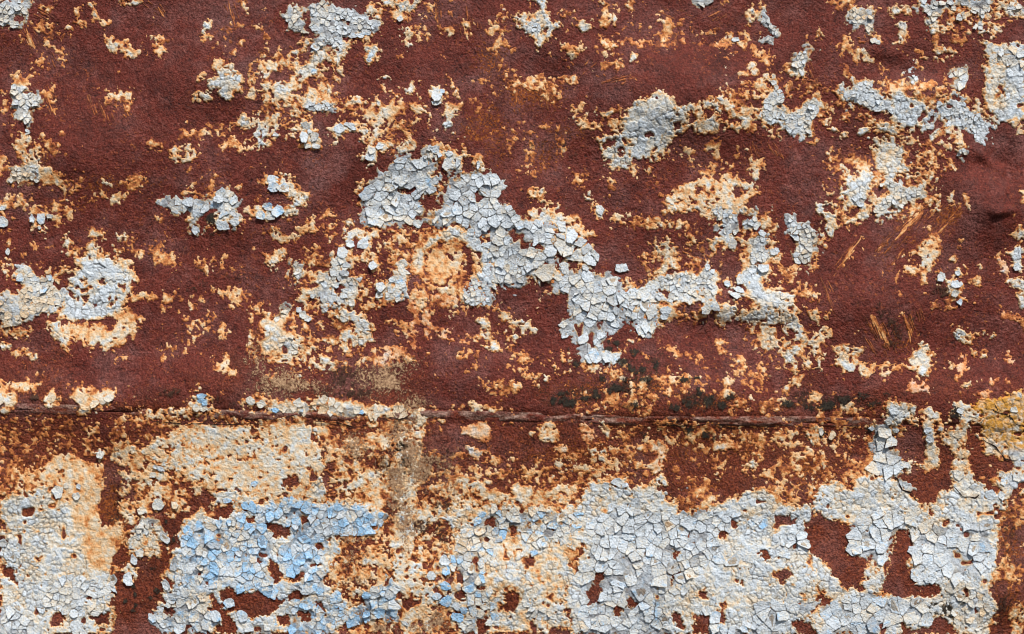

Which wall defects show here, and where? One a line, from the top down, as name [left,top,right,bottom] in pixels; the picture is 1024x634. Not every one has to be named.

peeling [0,0,58,44]
peeling [0,70,159,362]
peeling [64,1,173,60]
peeling [144,138,200,164]
rust [120,209,264,377]
rust [392,0,624,203]
peeling [155,0,1024,383]
rust [594,4,781,95]
rust [609,137,766,235]
rust [0,403,186,530]
peeling [0,326,1024,634]
rust [312,284,877,518]